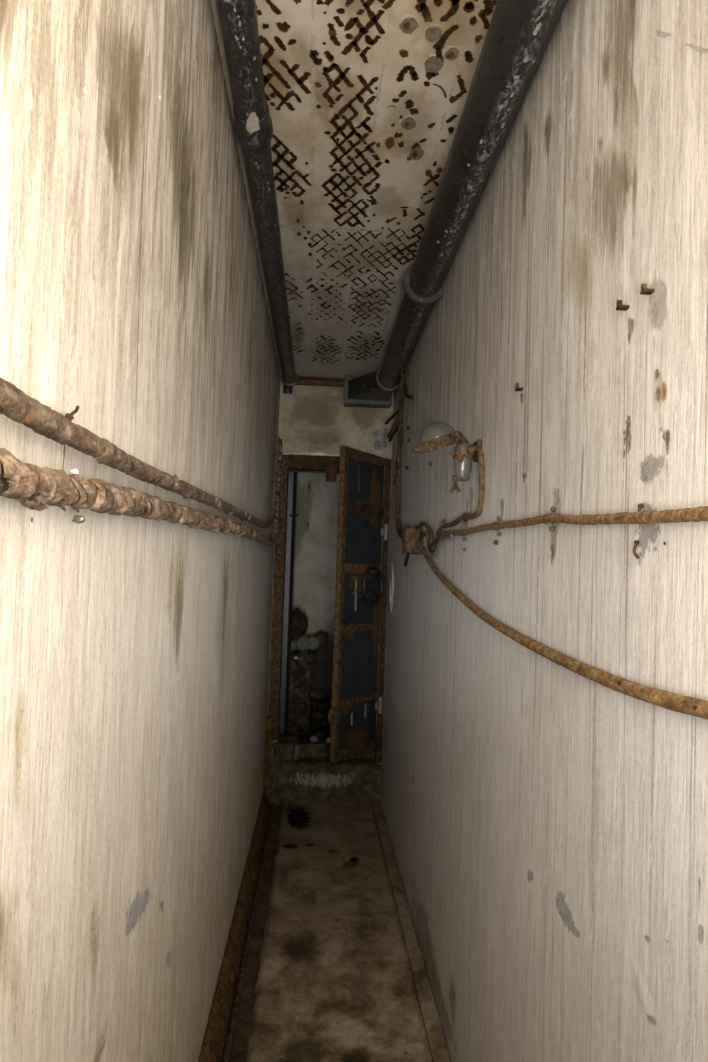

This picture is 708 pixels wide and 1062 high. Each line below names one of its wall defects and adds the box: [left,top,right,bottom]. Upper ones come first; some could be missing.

damp [107,114,119,185]
damp [169,73,194,315]
corrosion [256,0,497,363]
corrosion [623,415,632,458]
peeling [641,454,664,483]
damp [287,805,312,830]
damp [342,1047,372,1062]